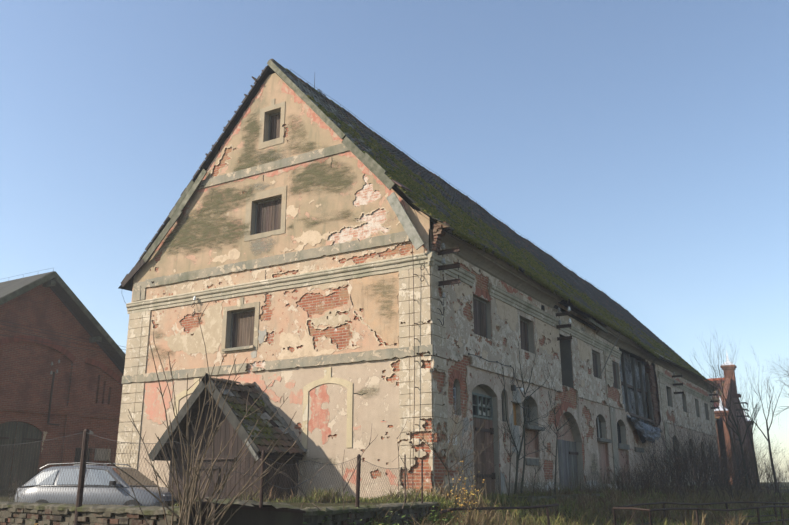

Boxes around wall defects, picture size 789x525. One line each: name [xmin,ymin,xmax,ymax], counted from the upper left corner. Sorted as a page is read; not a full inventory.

flaking render [150,82,414,272]
flaking render [163,301,227,362]
peeling [211,360,337,445]
flaking render [271,268,300,278]
peeling [260,271,403,360]
flaking render [382,358,400,386]
flaking render [410,340,471,419]
flaking render [446,255,518,355]
flaking render [525,305,560,365]
flaking render [547,338,595,485]
flaking render [343,418,458,494]